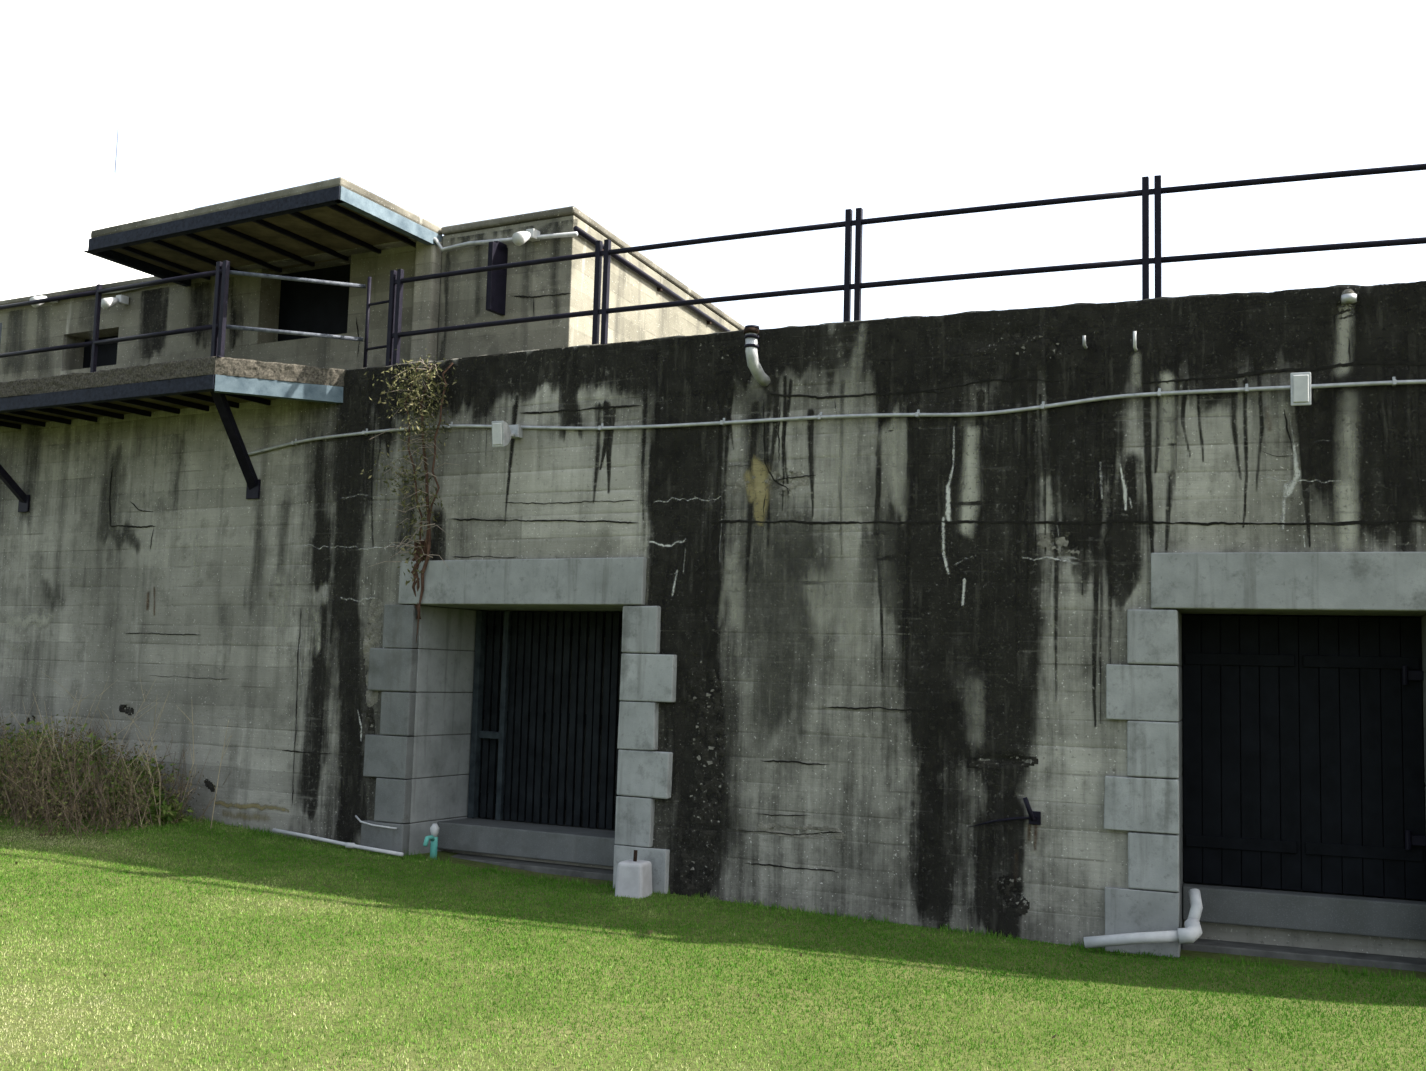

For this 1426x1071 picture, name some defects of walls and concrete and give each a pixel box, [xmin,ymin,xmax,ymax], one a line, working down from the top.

water stain [101,452,140,551]
water stain [299,367,415,843]
water stain [430,511,446,561]
water stain [559,350,616,503]
water stain [641,334,857,898]
corrosion [745,458,769,525]
water stain [837,281,1426,939]